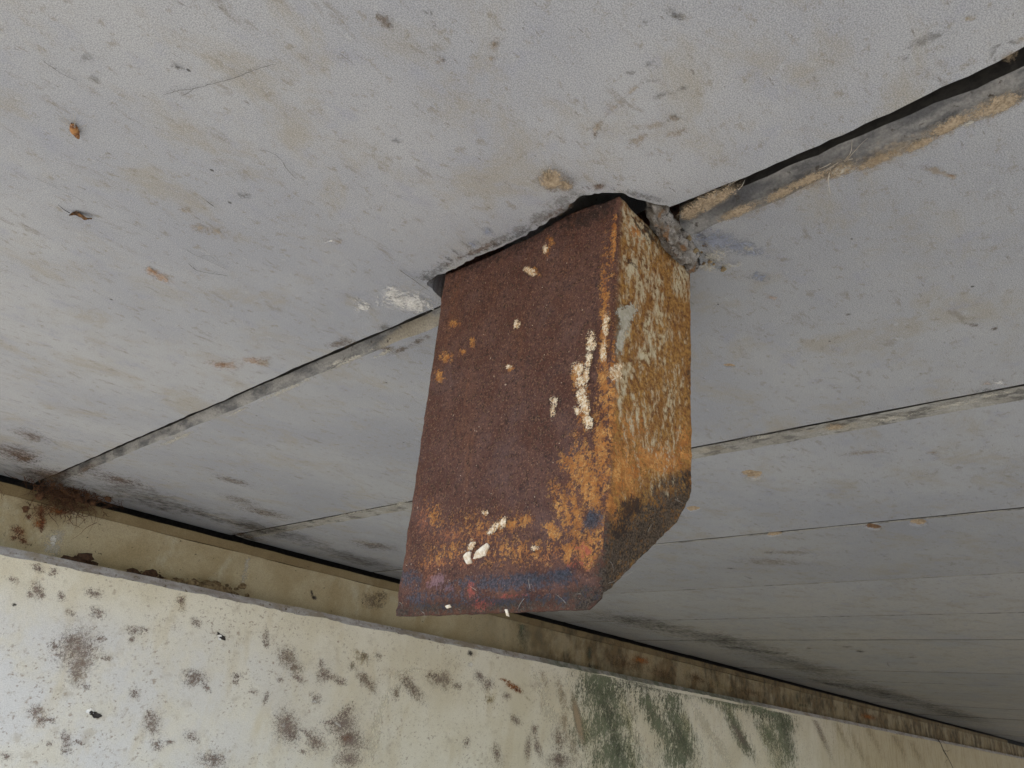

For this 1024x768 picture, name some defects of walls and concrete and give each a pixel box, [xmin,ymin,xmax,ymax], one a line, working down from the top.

leakage [27,530,64,599]
leakage [47,591,113,690]
leakage [28,705,85,755]
leakage [142,708,225,768]
leakage [184,669,211,693]
leakage [262,630,461,768]